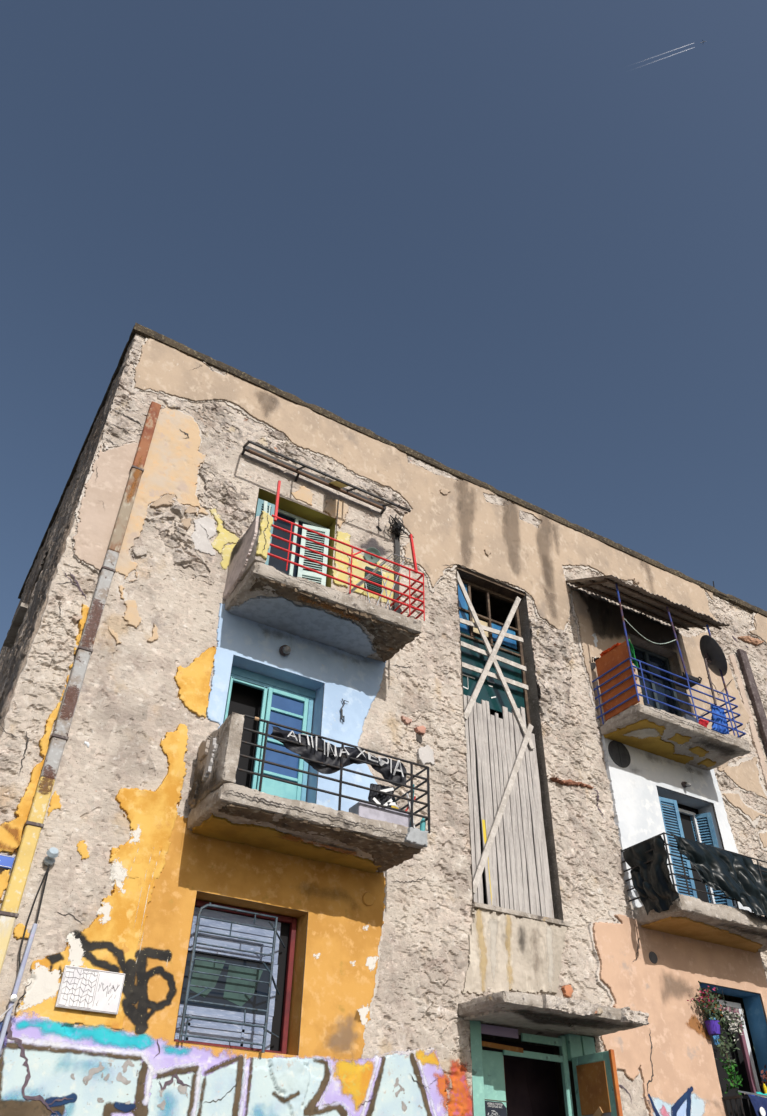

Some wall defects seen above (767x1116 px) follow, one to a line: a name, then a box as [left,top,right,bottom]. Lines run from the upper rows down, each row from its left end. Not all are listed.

corrosion [127,464,141,502]
flaking render [101,334,411,585]
flaking render [529,619,572,731]
peeling [0,603,89,855]
peeling [604,719,716,767]
flaking render [547,775,594,789]
peeling [13,646,216,1030]
peeling [0,869,10,903]
peeling [350,956,379,972]
water stain [476,910,523,991]
peeling [358,1003,369,1028]